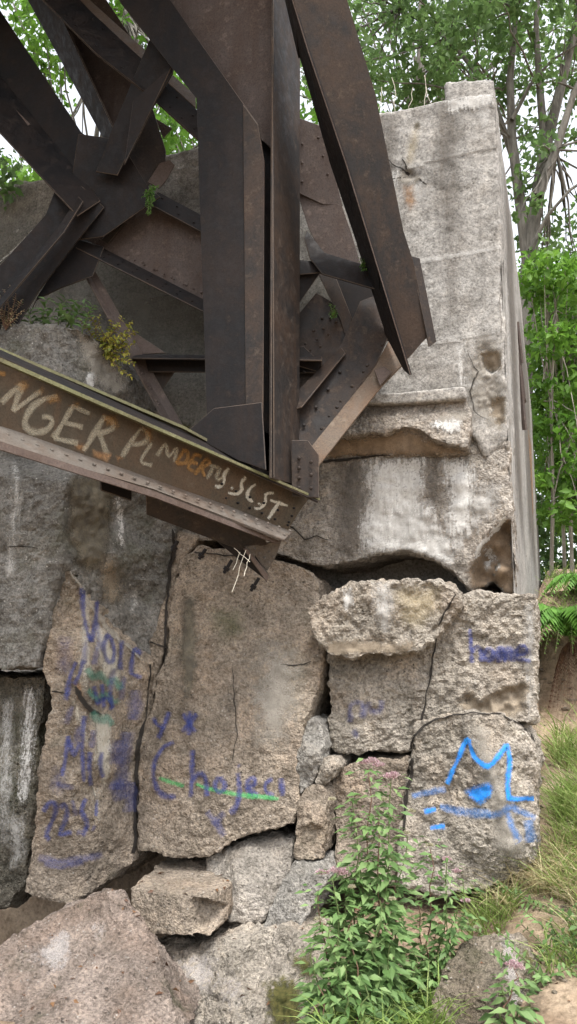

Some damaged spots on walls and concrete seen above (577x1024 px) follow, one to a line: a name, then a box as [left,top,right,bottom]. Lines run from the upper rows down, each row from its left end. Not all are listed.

spalling [437,336,507,431]
spalling [323,429,462,463]
leakage [340,456,496,567]
spalling [468,517,515,594]
crack [132,529,234,853]
crack [231,670,239,760]
crack [403,594,536,831]
efflorescence [1,688,36,856]